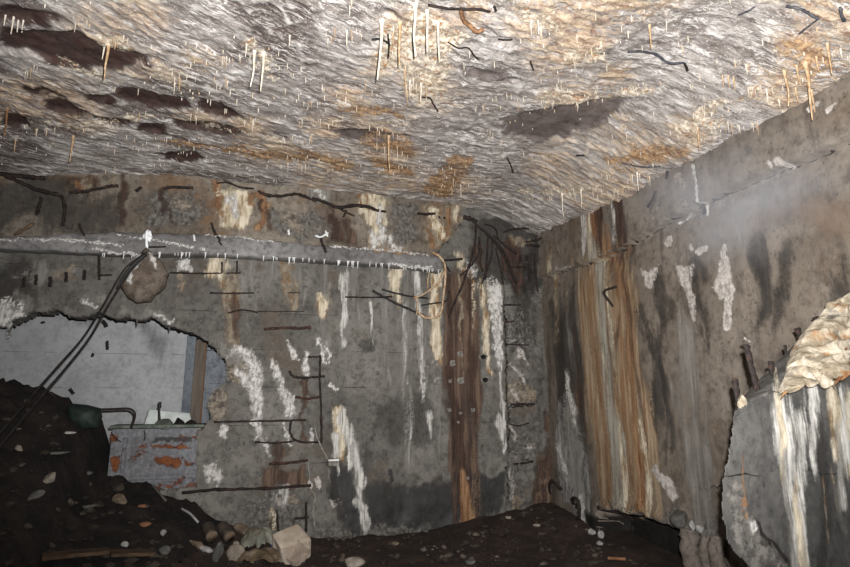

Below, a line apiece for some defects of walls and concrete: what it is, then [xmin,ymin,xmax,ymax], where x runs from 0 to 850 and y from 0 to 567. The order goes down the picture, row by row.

leakage [44,113,155,135]
corrosion [253,190,272,231]
leakage [737,227,790,318]
corrosion [442,266,483,524]
spalling [504,304,537,405]
leakage [454,218,682,557]
corrosion [571,199,662,524]
leakage [649,257,713,536]
leakage [269,484,288,531]
spalling [506,422,536,510]
spalling [726,480,787,567]
leakage [773,386,850,567]